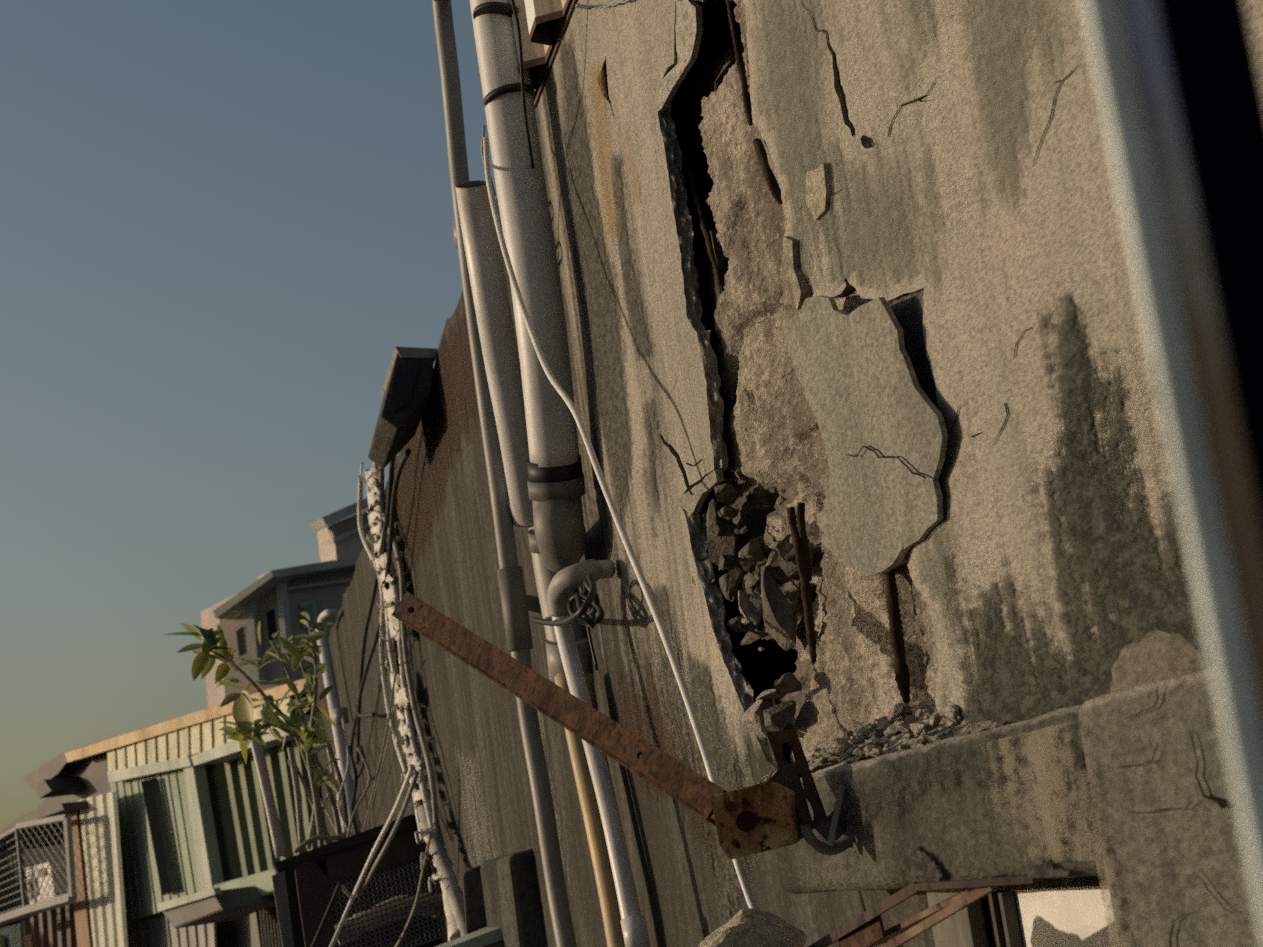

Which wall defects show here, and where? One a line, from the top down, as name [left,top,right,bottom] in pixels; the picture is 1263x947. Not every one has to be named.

crack [800,0,937,148]
crack [1032,64,1079,166]
spalling [657,0,948,774]
damp [806,293,1211,853]
crack [1131,731,1228,813]
crack [1169,912,1186,947]